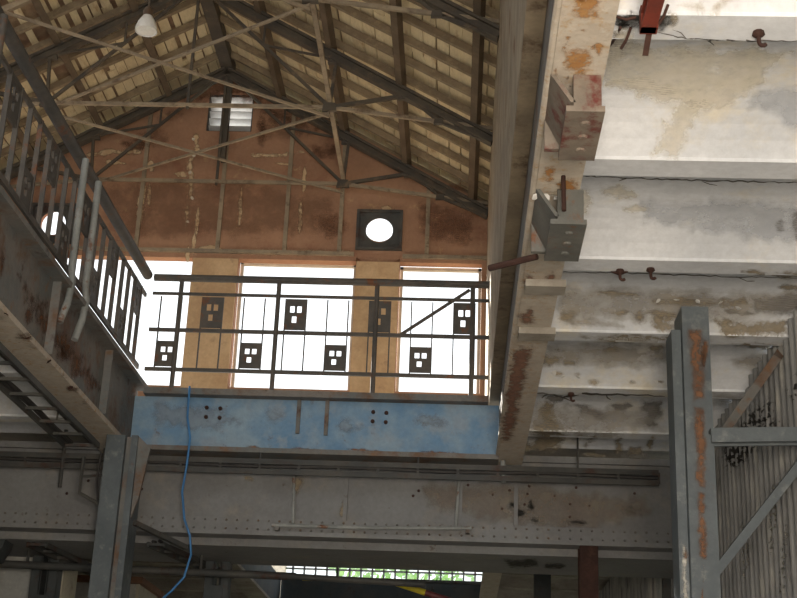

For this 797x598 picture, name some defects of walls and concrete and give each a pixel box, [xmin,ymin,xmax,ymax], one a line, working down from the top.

corrosion [563,37,603,87]
corrosion [574,0,598,18]
spalling [610,11,639,49]
spalling [658,4,678,31]
corrosion [24,285,100,391]
corrosion [502,349,532,441]
corrosion [689,330,708,398]
corrosion [695,408,707,558]